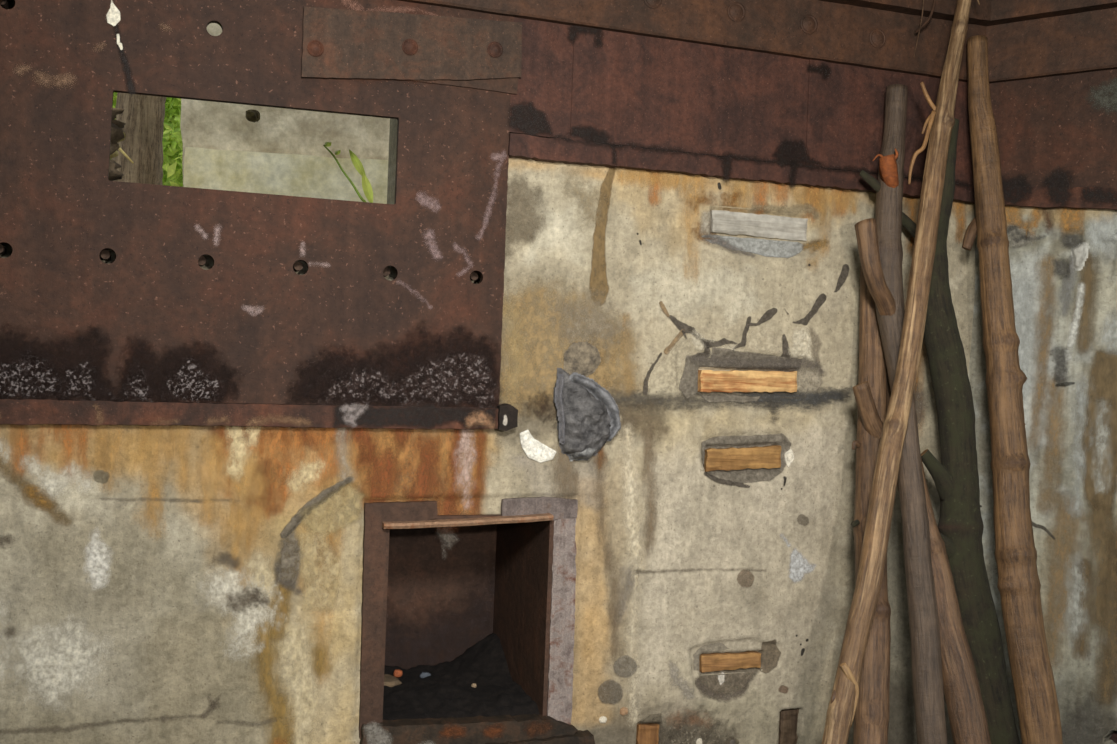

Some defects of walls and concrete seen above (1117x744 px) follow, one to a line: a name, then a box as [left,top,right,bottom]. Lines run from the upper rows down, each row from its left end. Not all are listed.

corrosion [1005,206,1083,238]
corrosion [0,329,237,474]
corrosion [208,328,498,533]
crack [643,264,849,395]
leakage [1013,254,1117,703]